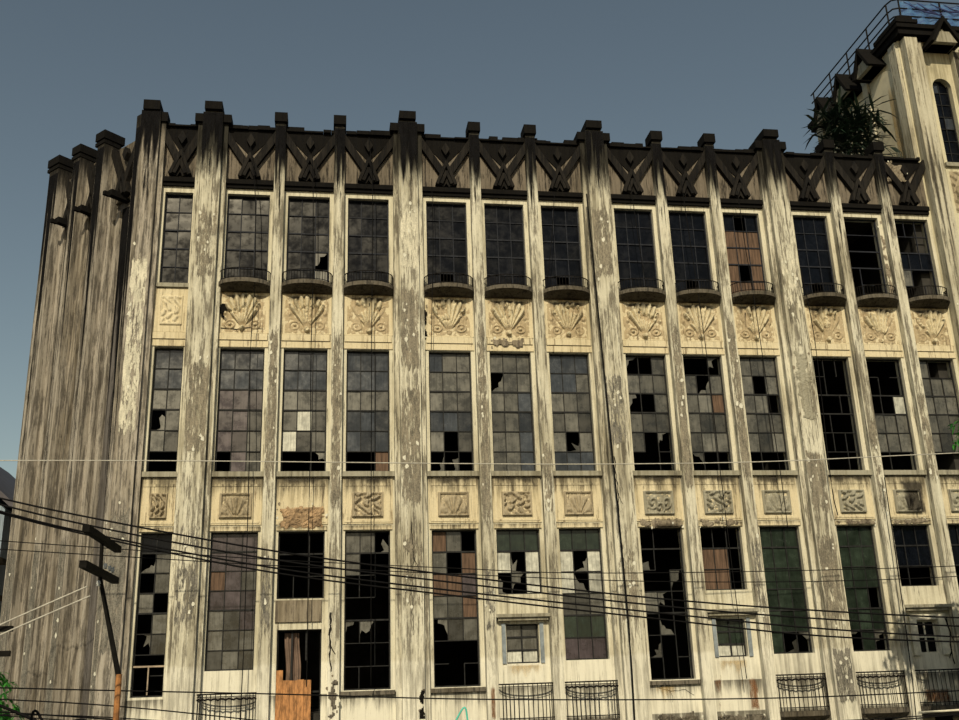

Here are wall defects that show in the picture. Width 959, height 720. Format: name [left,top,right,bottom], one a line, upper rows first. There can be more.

damp [27,173,58,402]
damp [45,160,80,463]
damp [79,146,104,371]
peeling [118,242,148,435]
damp [585,131,605,184]